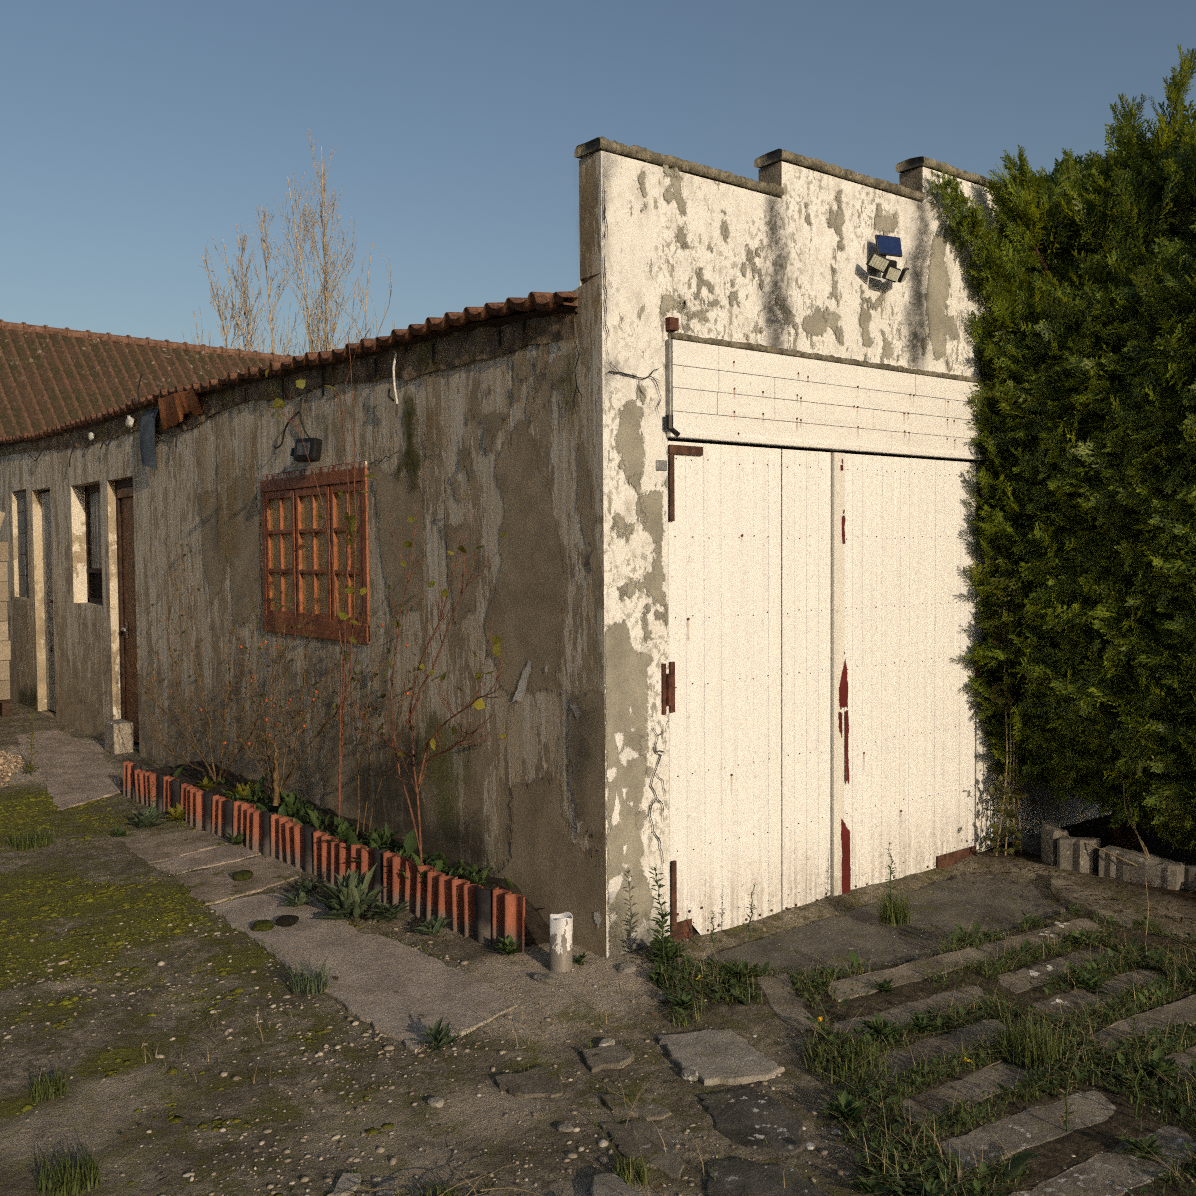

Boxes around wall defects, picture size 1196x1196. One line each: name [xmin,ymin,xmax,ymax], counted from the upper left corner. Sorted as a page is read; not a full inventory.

peeling [638,166,648,212]
peeling [663,164,691,250]
peeling [707,209,730,252]
peeling [660,243,845,346]
leakage [768,209,788,348]
peeling [805,188,846,251]
peeling [856,284,900,364]
leakage [909,205,929,368]
peeling [0,310,668,958]
crack [645,728,666,877]